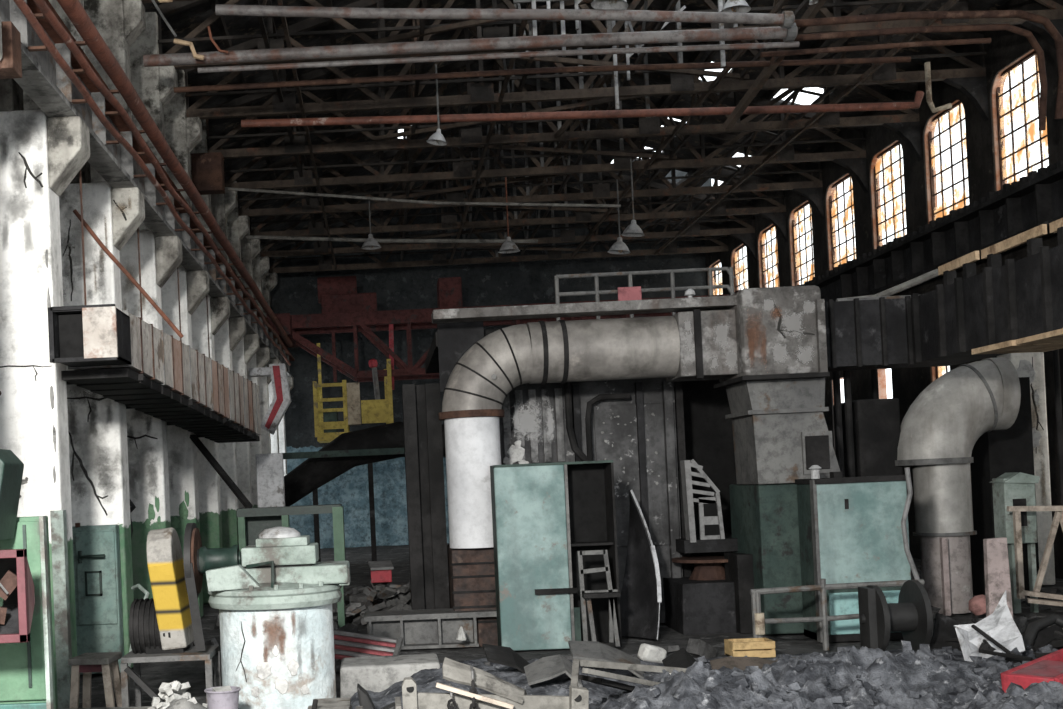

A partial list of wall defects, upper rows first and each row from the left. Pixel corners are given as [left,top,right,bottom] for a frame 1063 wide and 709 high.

damp [2,138,22,182]
crack [18,152,43,188]
crack [67,396,108,516]
flaking render [503,440,529,465]